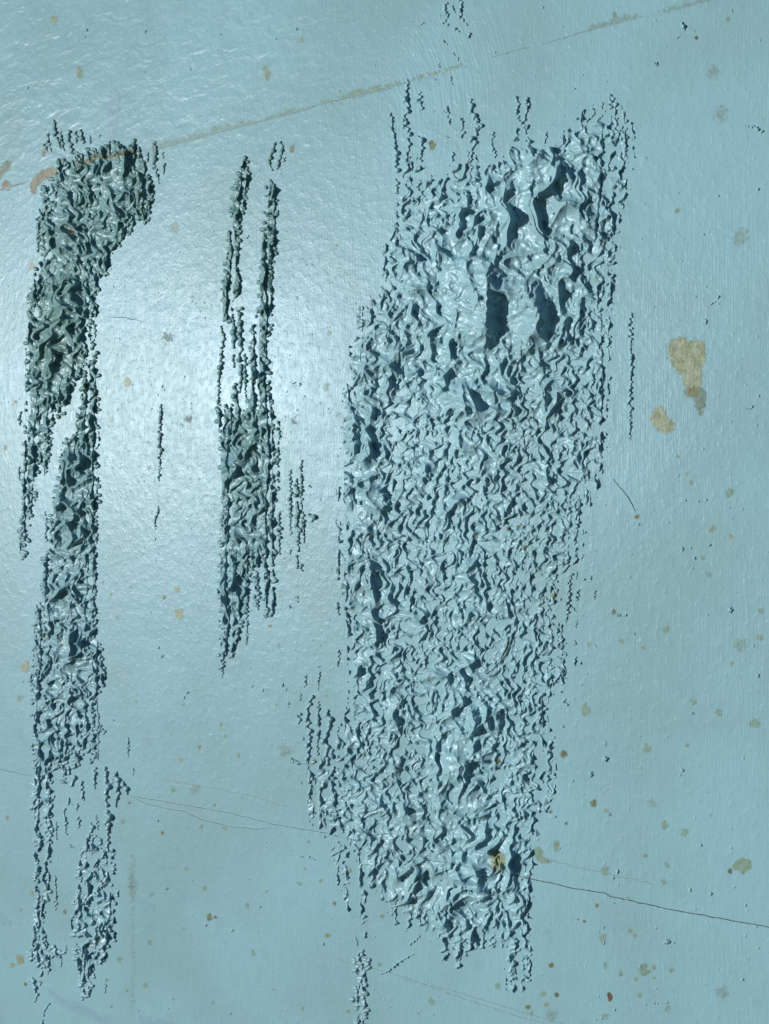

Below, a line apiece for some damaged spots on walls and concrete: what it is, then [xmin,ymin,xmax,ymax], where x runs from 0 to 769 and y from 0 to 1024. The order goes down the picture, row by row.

damp [667,336,706,396]
damp [650,406,676,434]
crack [130,779,347,839]
crack [417,853,769,929]